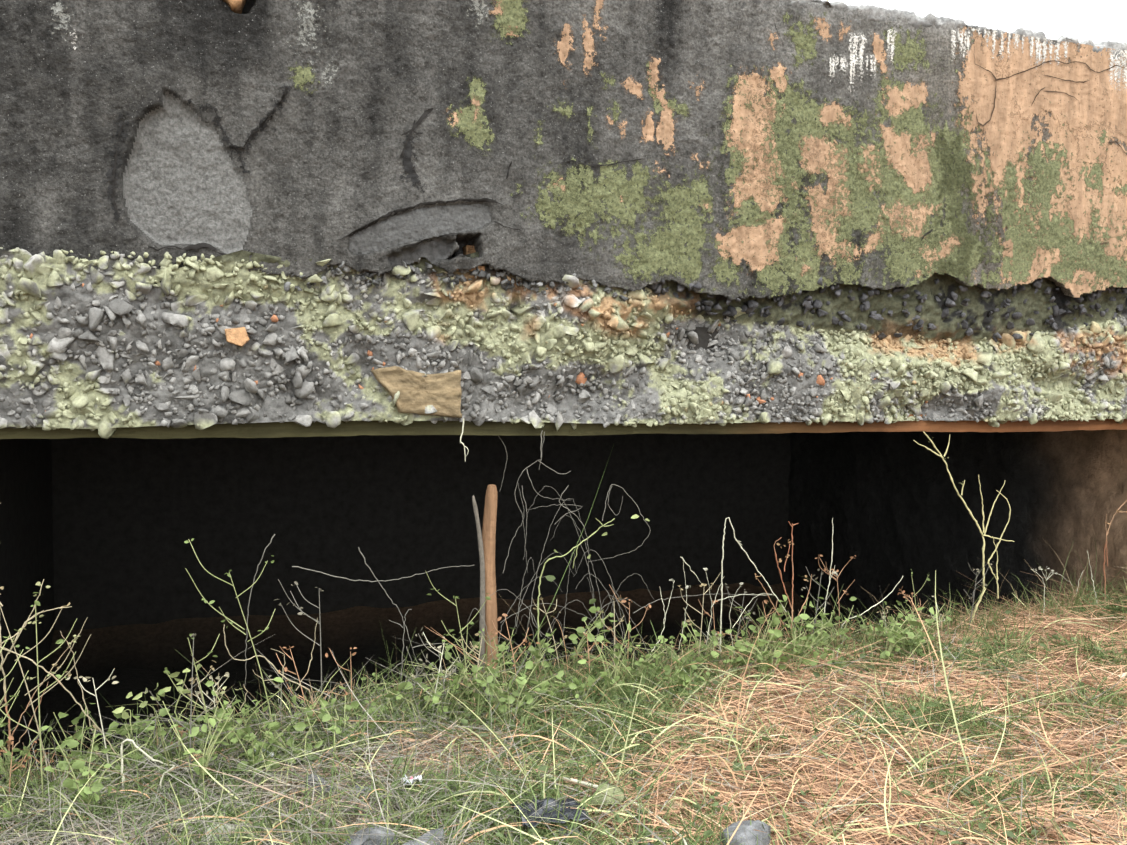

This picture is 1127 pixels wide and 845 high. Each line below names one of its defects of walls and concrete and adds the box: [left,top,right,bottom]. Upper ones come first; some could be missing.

spalling [223,0,255,14]
flaking render [489,1,519,37]
flaking render [554,0,608,75]
flaking render [813,17,851,42]
damp [829,30,897,93]
damp [950,27,1069,70]
crack [974,48,1127,139]
damp [1108,49,1127,95]
crack [400,108,433,158]
crack [338,161,521,240]
crack [403,233,458,247]
spalling [0,26,1127,439]